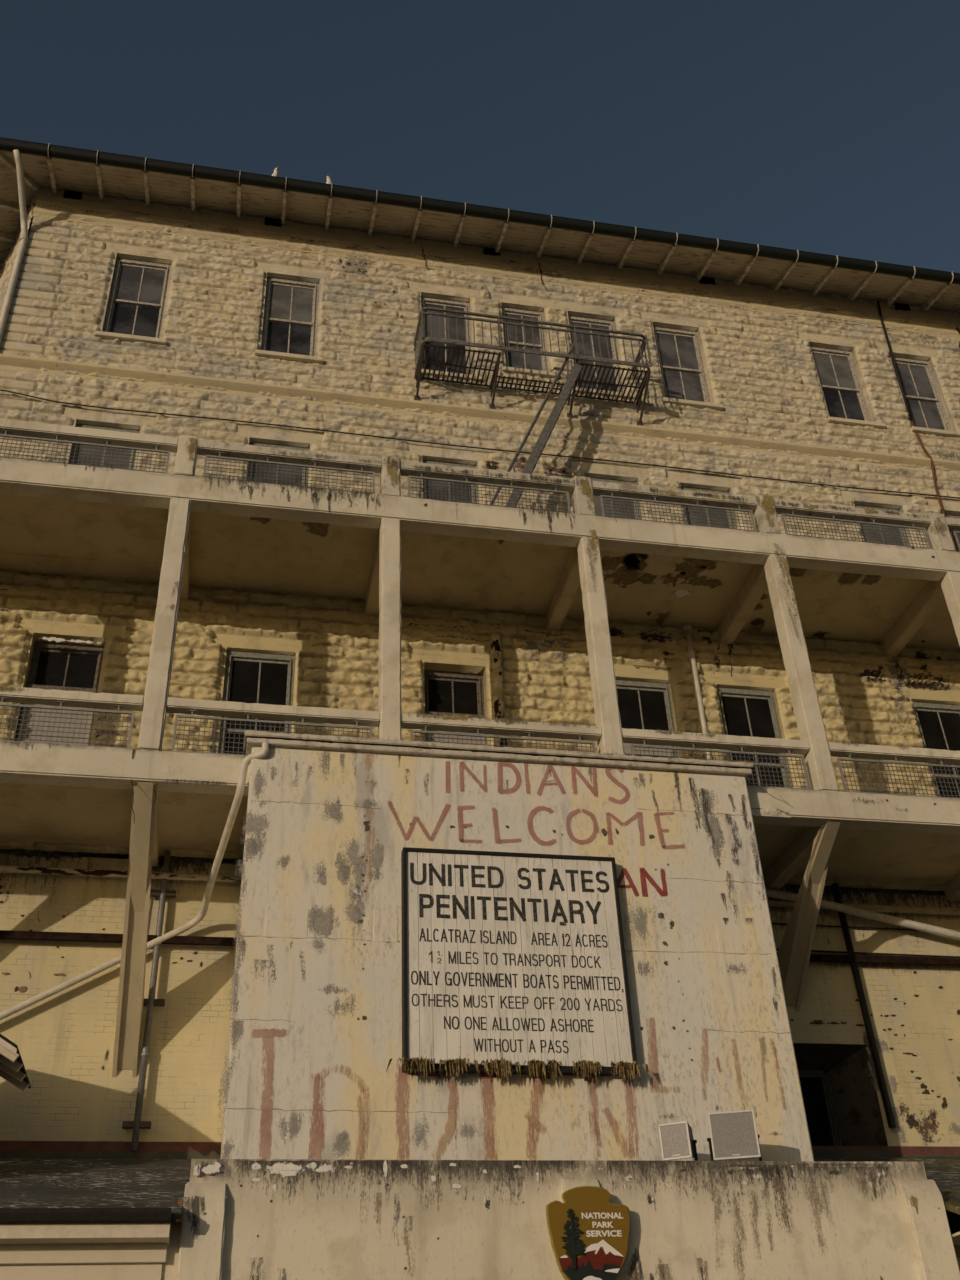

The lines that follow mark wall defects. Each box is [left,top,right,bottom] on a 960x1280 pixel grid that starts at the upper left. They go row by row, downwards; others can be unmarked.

peeling [601,553,726,598]
flaking render [610,611,675,671]
flaking render [857,640,954,691]
leakage [294,751,376,786]
leakage [151,855,214,892]
leakage [219,767,305,1111]
leakage [816,886,959,945]
leakage [320,984,355,1016]
peeling [810,994,960,1145]
peeling [193,1141,234,1178]
peeling [240,1161,353,1203]
leakage [607,1160,896,1271]